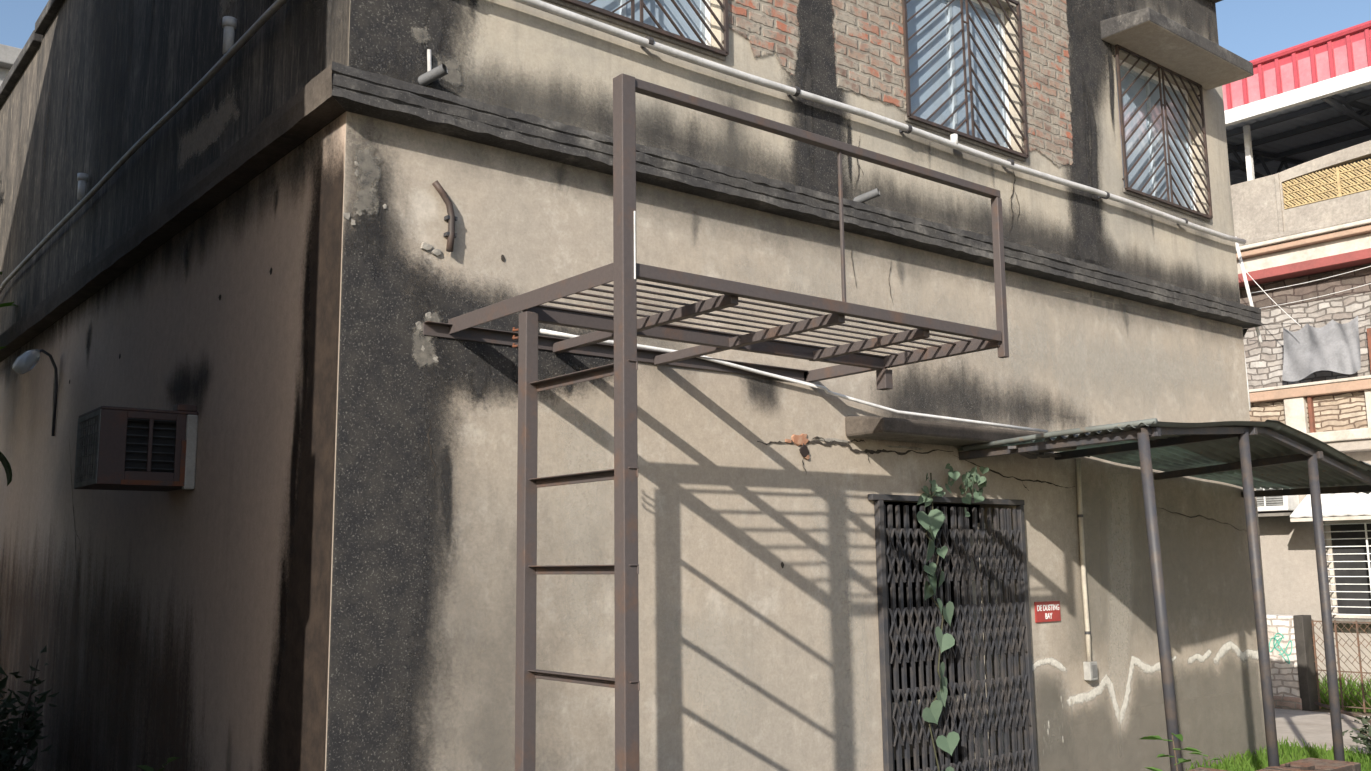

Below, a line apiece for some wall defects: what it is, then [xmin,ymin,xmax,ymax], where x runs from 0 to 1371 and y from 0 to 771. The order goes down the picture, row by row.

flaking render [831,0,907,111]
leakage [636,0,1240,303]
flaking render [1019,0,1073,168]
leakage [538,323,614,395]
leakage [0,123,523,771]
crack [757,436,1075,491]